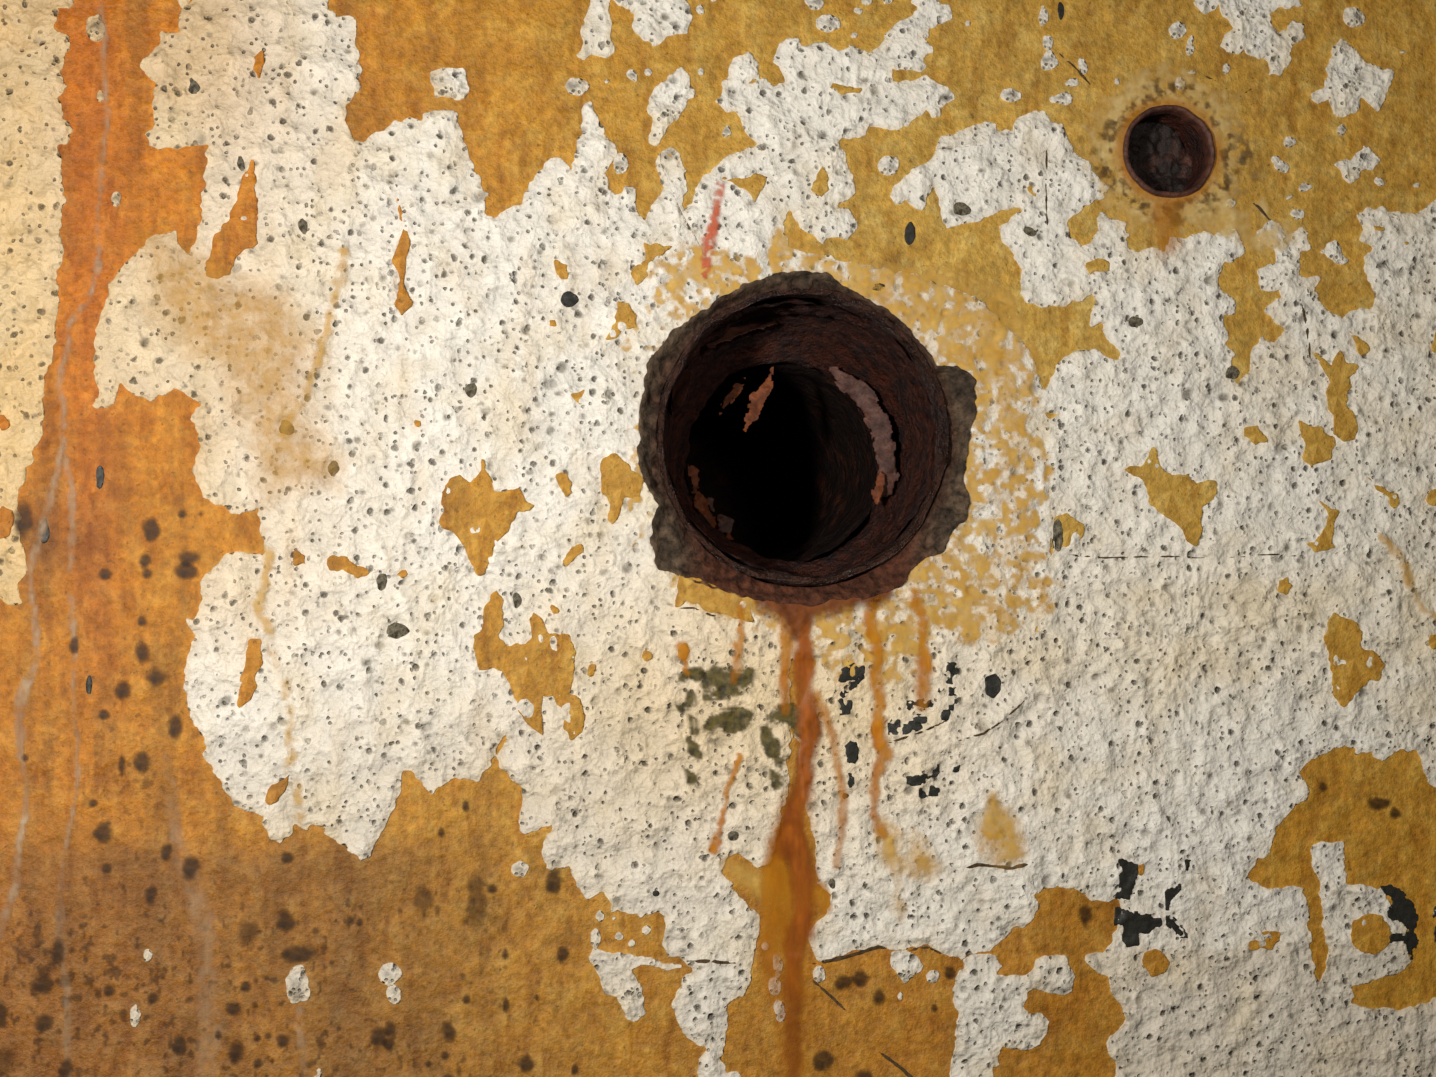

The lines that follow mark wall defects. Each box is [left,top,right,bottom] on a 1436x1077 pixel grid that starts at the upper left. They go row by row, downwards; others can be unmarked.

peeling [1193,0,1306,76]
peeling [0,0,74,605]
corrosion [719,367,774,432]
corrosion [827,366,900,505]
damp [140,520,159,578]
damp [176,553,197,577]
peeling [92,0,977,1077]
peeling [768,73,1436,1077]
corrosion [709,753,742,854]
corrosion [734,590,892,1041]
damp [547,871,560,893]
damp [283,948,313,962]